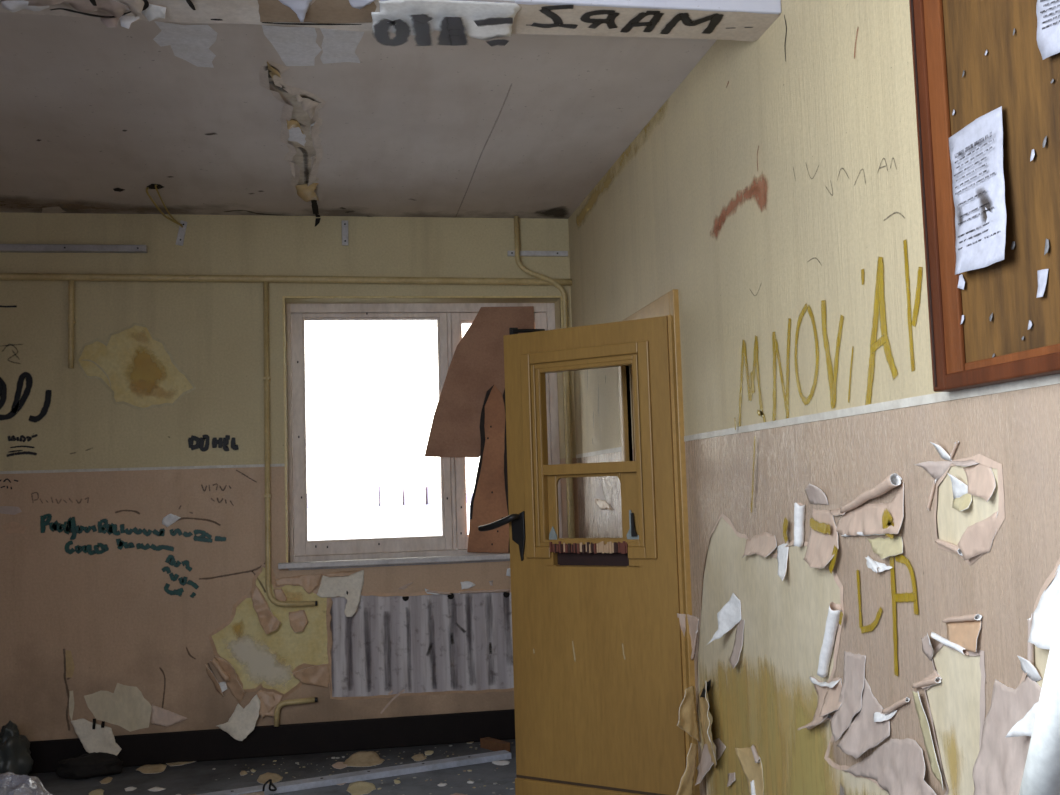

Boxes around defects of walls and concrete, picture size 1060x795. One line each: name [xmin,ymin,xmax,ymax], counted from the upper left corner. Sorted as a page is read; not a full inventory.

peeling [0,0,780,202]
crack [311,200,319,214]
peeling [915,441,1005,565]
peeling [71,683,188,756]
peeling [205,564,364,741]
peeling [676,473,1060,795]